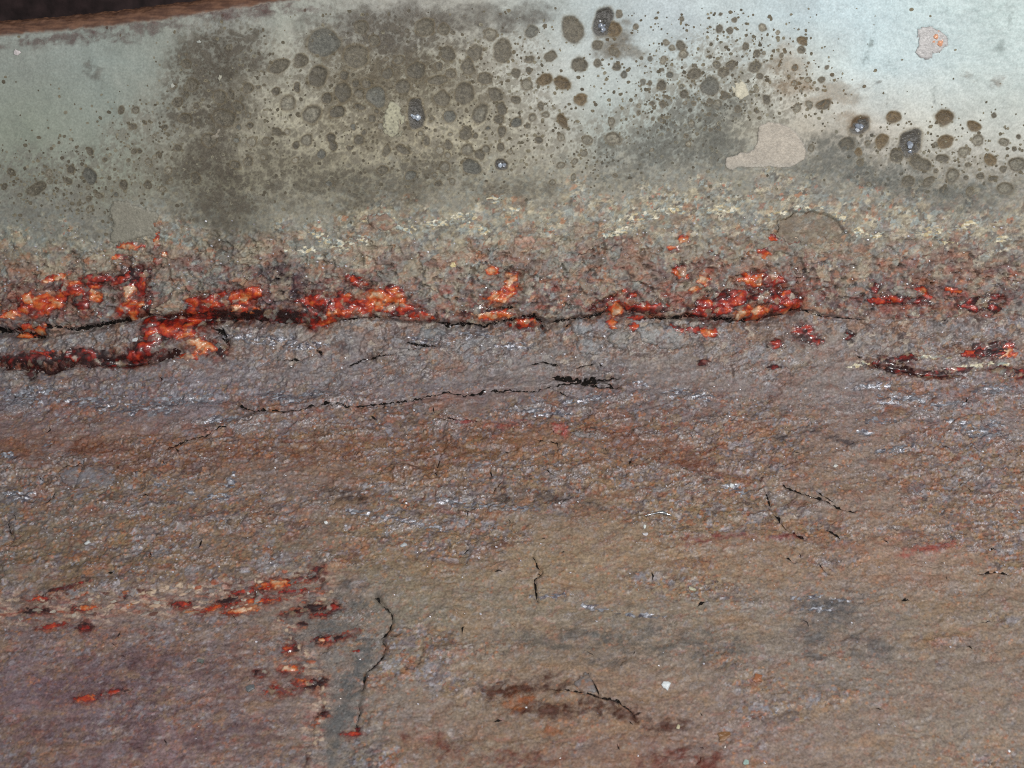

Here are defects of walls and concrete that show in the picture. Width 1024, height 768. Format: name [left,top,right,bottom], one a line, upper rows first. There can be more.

leakage [177,31,262,97]
leakage [336,10,465,72]
peeling [637,39,814,170]
peeling [916,26,948,60]
leakage [181,108,253,230]
corrosion [0,233,446,381]
corrosion [454,264,537,329]
corrosion [569,234,807,350]
corrosion [865,340,1024,380]
crack [166,379,614,450]
corrosion [168,565,361,652]
crack [356,598,393,728]